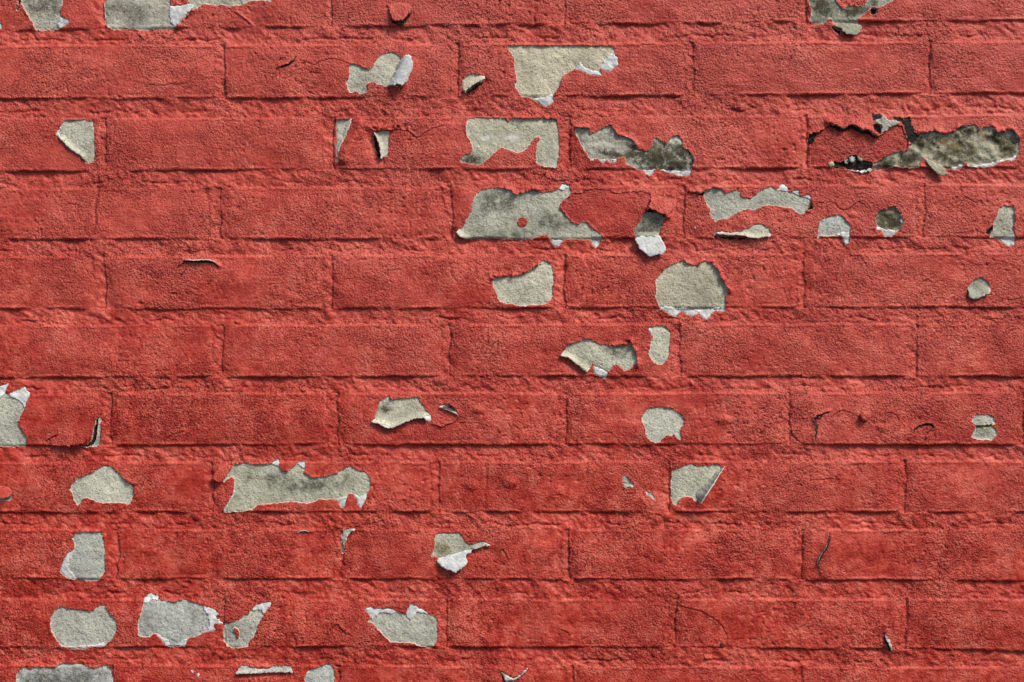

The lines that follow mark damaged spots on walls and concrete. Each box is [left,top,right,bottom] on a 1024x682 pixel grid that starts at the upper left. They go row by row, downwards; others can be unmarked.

peeling [460,45,618,168]
peeling [807,114,1019,176]
peeling [456,184,677,257]
peeling [694,184,813,240]
peeling [493,261,554,306]
peeling [655,261,728,319]
peeling [70,466,138,505]
peeling [213,459,371,512]
peeling [60,532,106,581]
peeling [51,605,117,650]
peeling [138,593,271,648]
peeling [365,604,438,648]